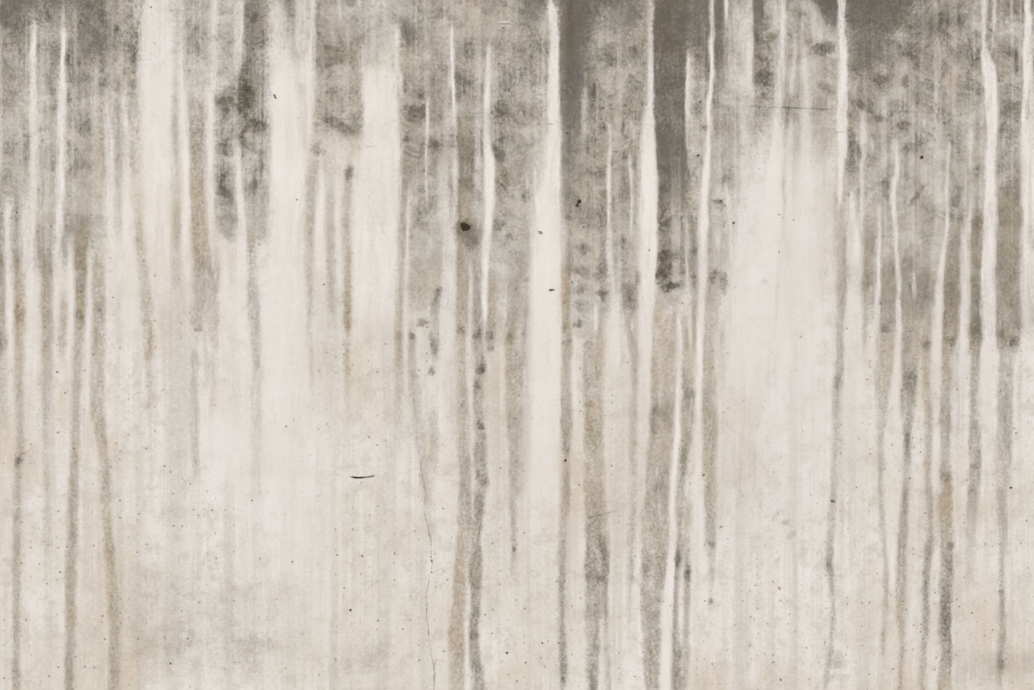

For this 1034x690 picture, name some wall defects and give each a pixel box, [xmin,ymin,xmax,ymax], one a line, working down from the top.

water stain [0,0,647,690]